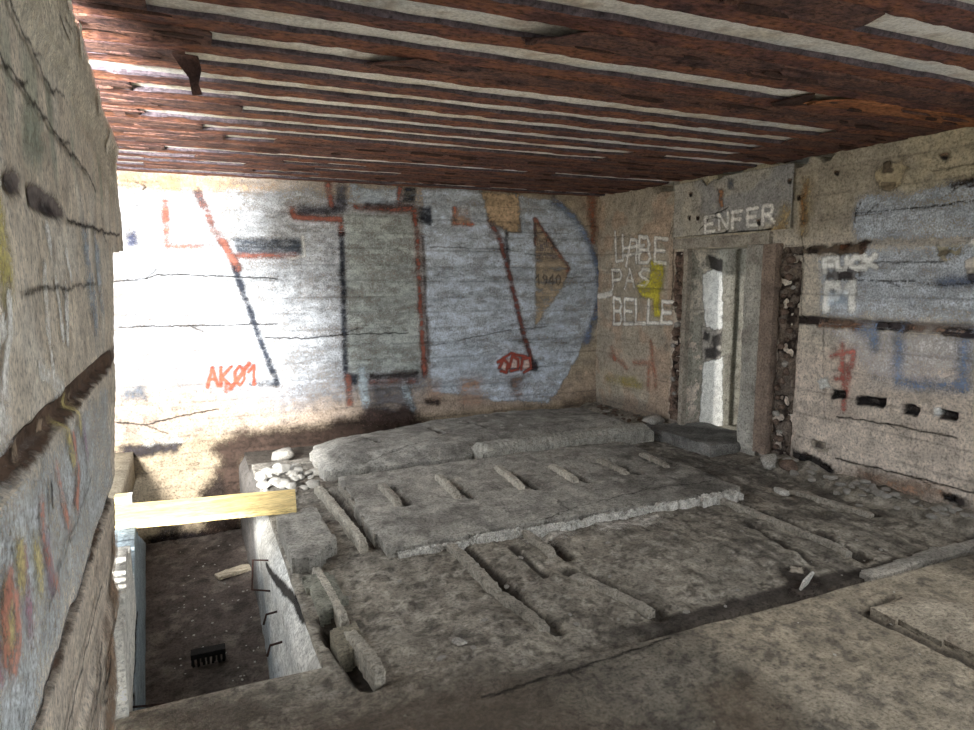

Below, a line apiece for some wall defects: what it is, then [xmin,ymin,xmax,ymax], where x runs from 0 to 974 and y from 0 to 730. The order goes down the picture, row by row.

crack [0,0,96,192]
peeling [28,0,974,198]
crack [67,218,120,241]
spalling [937,245,974,281]
crack [25,269,277,298]
crack [117,408,218,433]